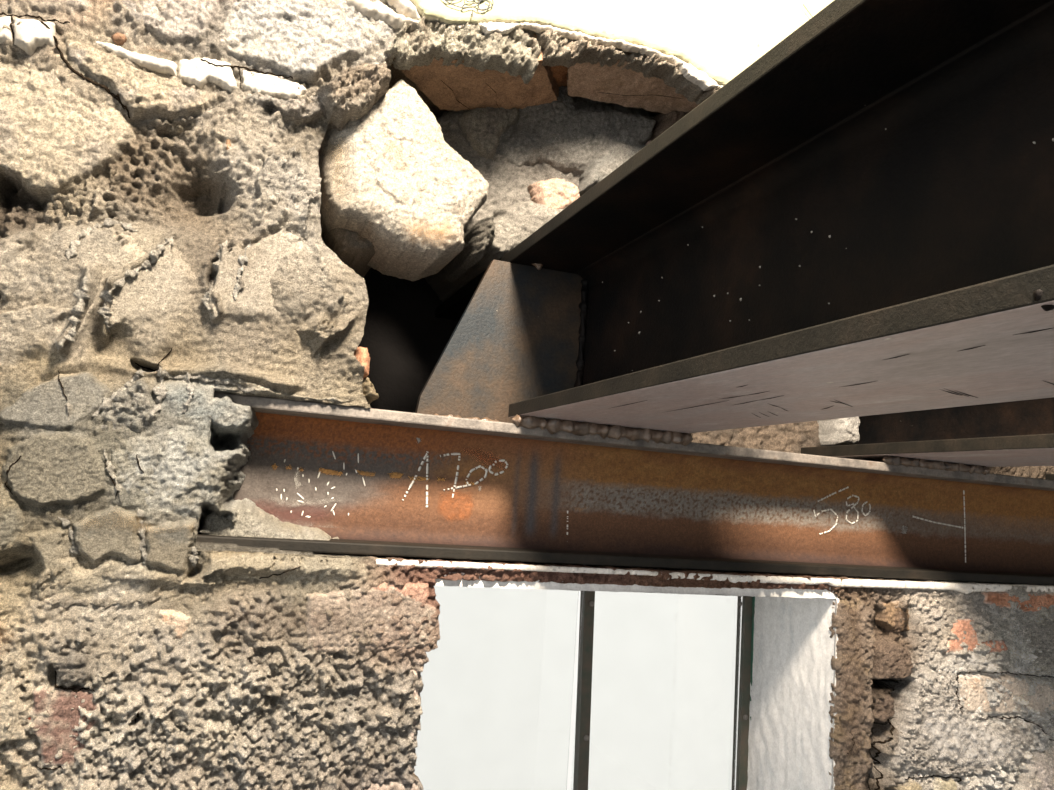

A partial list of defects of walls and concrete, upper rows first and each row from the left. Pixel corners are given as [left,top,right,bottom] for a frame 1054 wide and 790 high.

crack [0,12,131,118]
crack [200,59,293,86]
spalling [346,0,723,105]
crack [847,721,962,790]